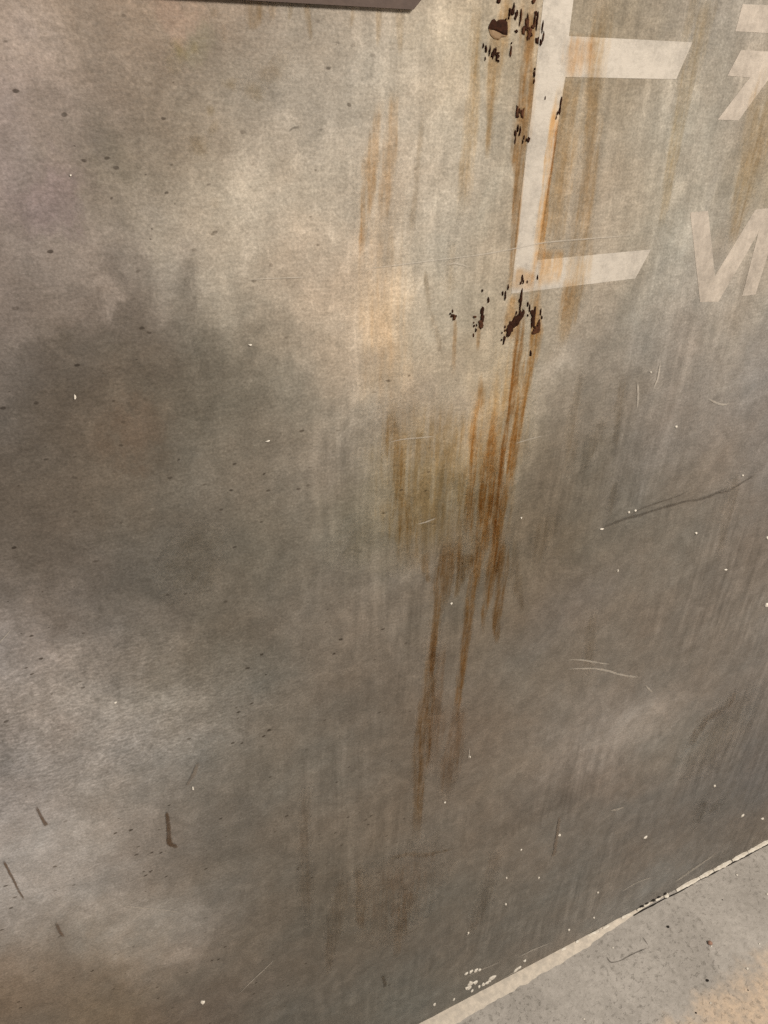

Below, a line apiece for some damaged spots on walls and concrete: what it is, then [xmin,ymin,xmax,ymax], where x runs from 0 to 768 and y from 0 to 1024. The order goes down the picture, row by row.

spalling [482,0,545,62]